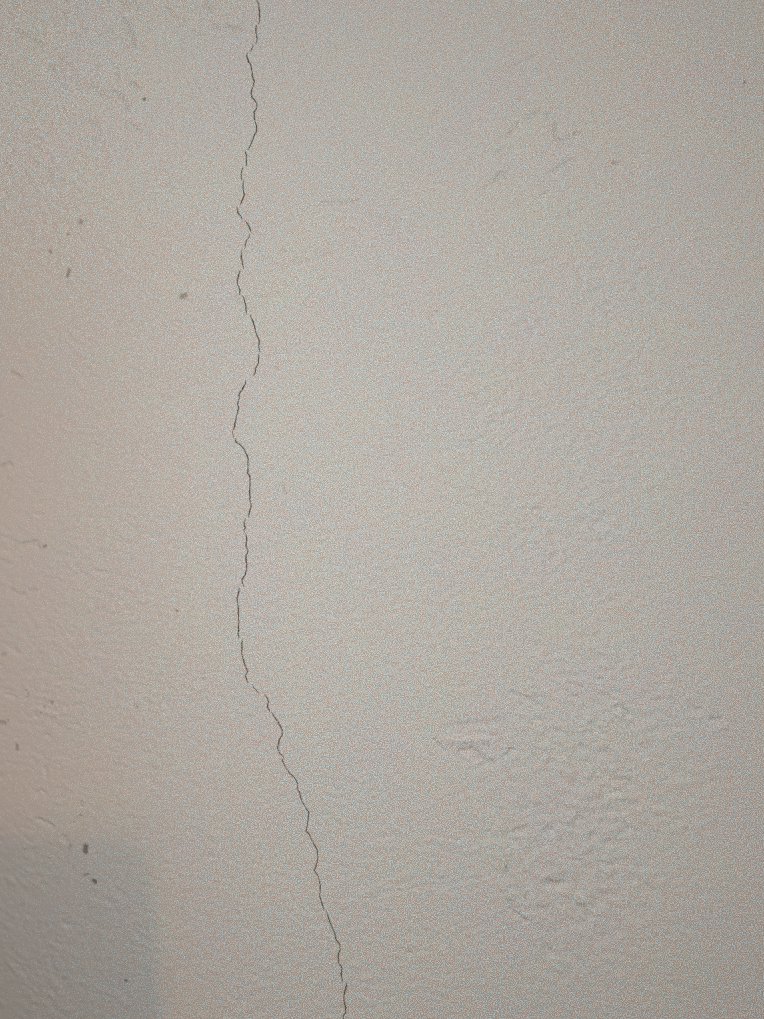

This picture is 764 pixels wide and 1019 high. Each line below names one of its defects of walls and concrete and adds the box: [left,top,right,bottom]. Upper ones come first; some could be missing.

crack [232,0,347,1019]